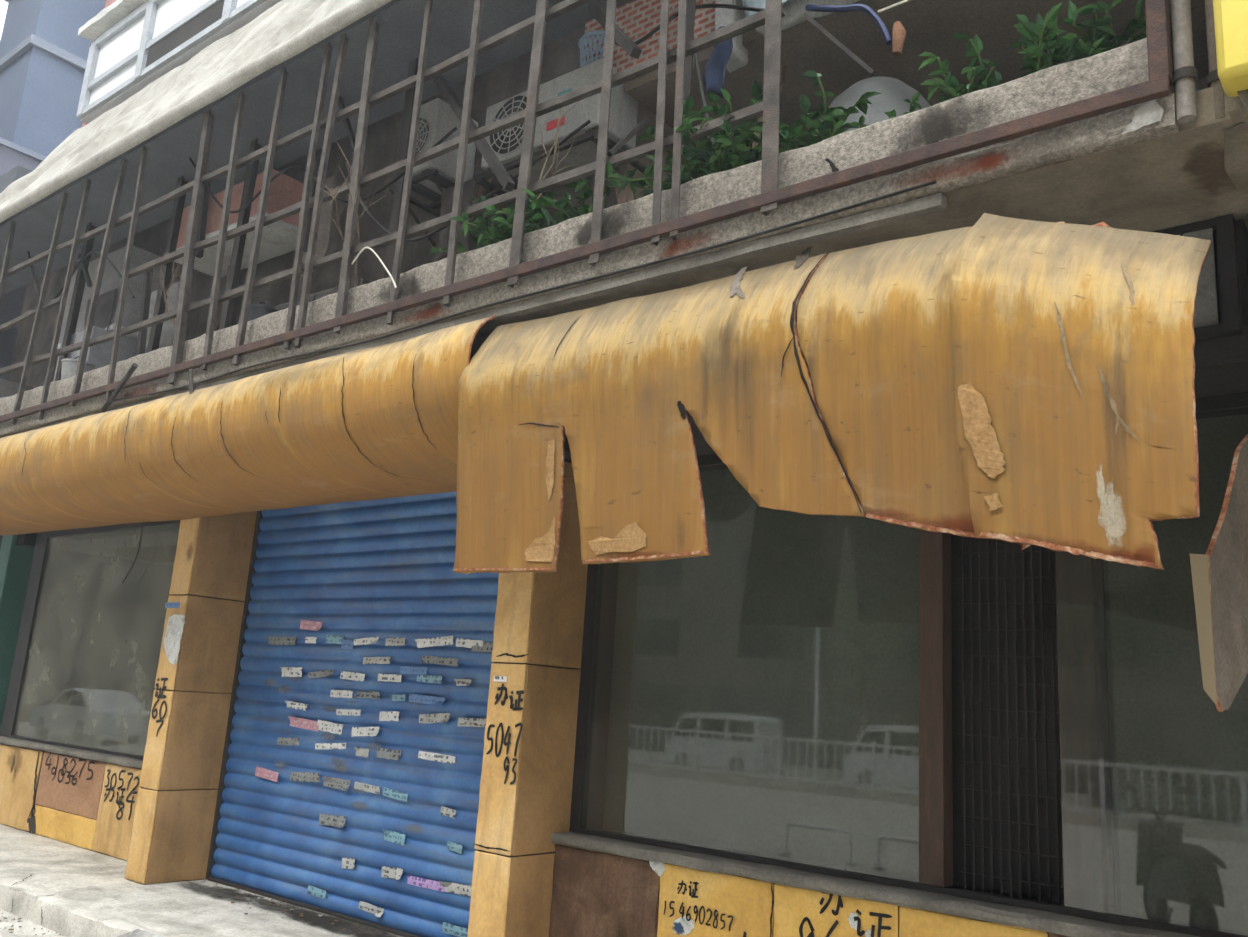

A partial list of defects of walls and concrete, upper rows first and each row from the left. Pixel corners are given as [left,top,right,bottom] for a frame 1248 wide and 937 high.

crack [124,410,202,484]
crack [220,400,264,479]
crack [341,358,421,480]
crack [412,355,436,449]
crack [781,254,861,512]
peeling [958,382,1006,512]
peeling [588,522,646,555]
peeling [163,614,185,666]
crack [28,752,39,818]